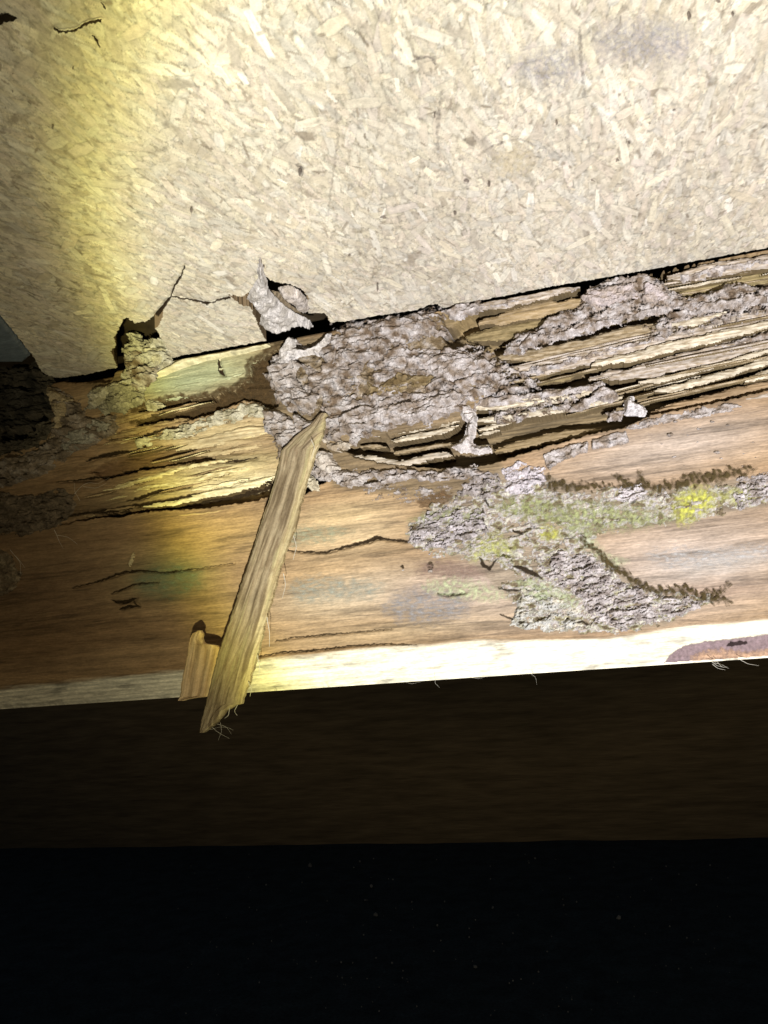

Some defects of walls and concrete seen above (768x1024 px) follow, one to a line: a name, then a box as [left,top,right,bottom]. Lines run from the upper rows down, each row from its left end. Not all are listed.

crack [155,266,231,317]
crack [56,422,274,519]
water stain [405,466,768,636]